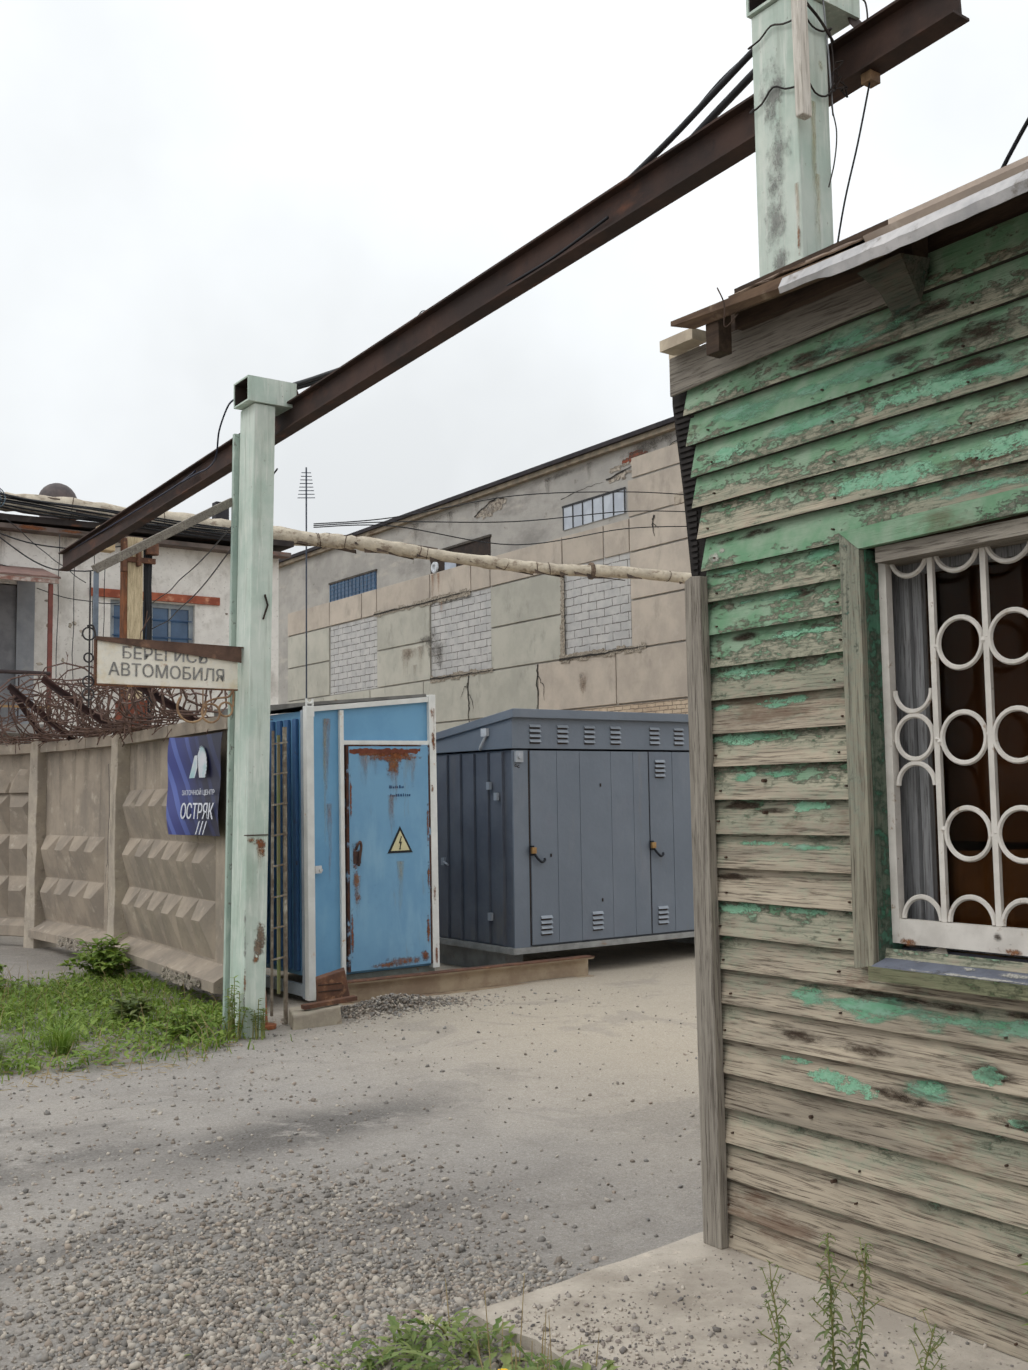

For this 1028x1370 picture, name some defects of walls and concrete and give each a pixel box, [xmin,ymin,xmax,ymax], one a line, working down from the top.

peeling [770,358,1025,450]
peeling [829,429,1028,499]
peeling [734,632,755,641]
peeling [772,626,836,638]
peeling [757,695,807,708]
peeling [713,732,777,746]
corrosion [349,733,435,773]
peeling [726,801,831,813]
peeling [719,902,828,915]
peeling [946,968,1028,984]
peeling [792,985,1028,1039]
peeling [781,1055,879,1100]